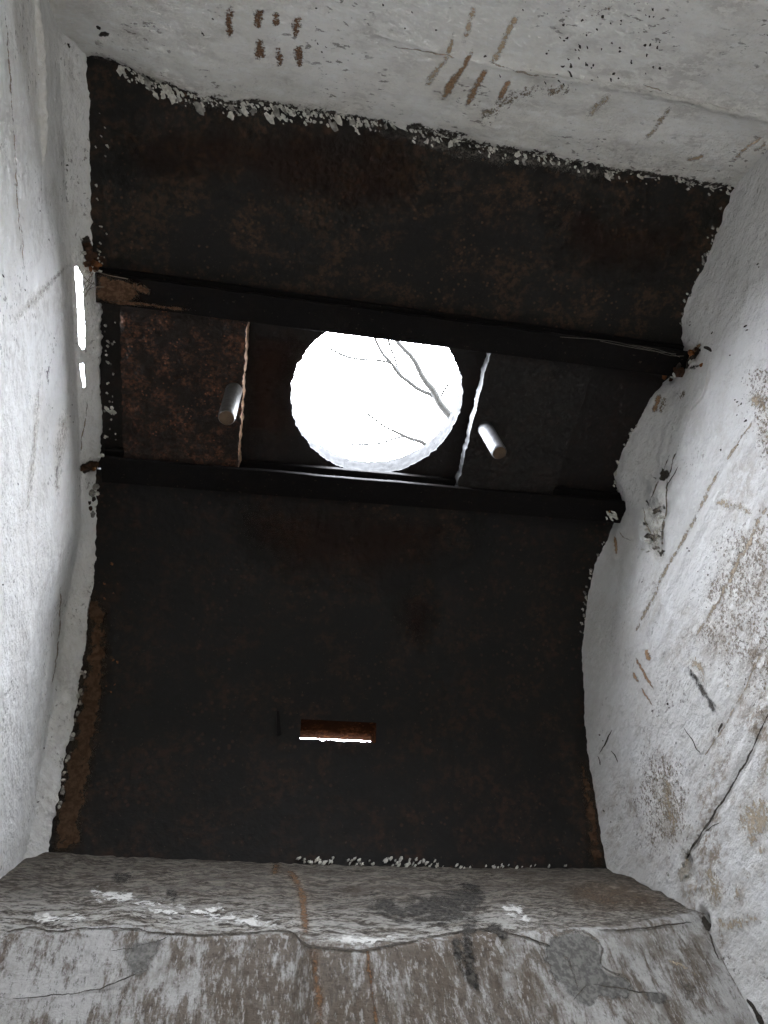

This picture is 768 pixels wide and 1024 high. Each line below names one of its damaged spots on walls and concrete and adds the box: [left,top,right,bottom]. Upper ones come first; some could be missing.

rust [224,6,234,36]
rust [253,10,303,67]
rust [442,52,473,100]
rust [466,17,517,105]
spalling [544,7,622,86]
peeling [116,65,590,173]
peeling [604,170,660,184]
peeling [674,177,731,196]
rust [96,275,188,311]
rust [54,582,118,851]
crack [686,715,768,860]
crack [13,973,137,999]